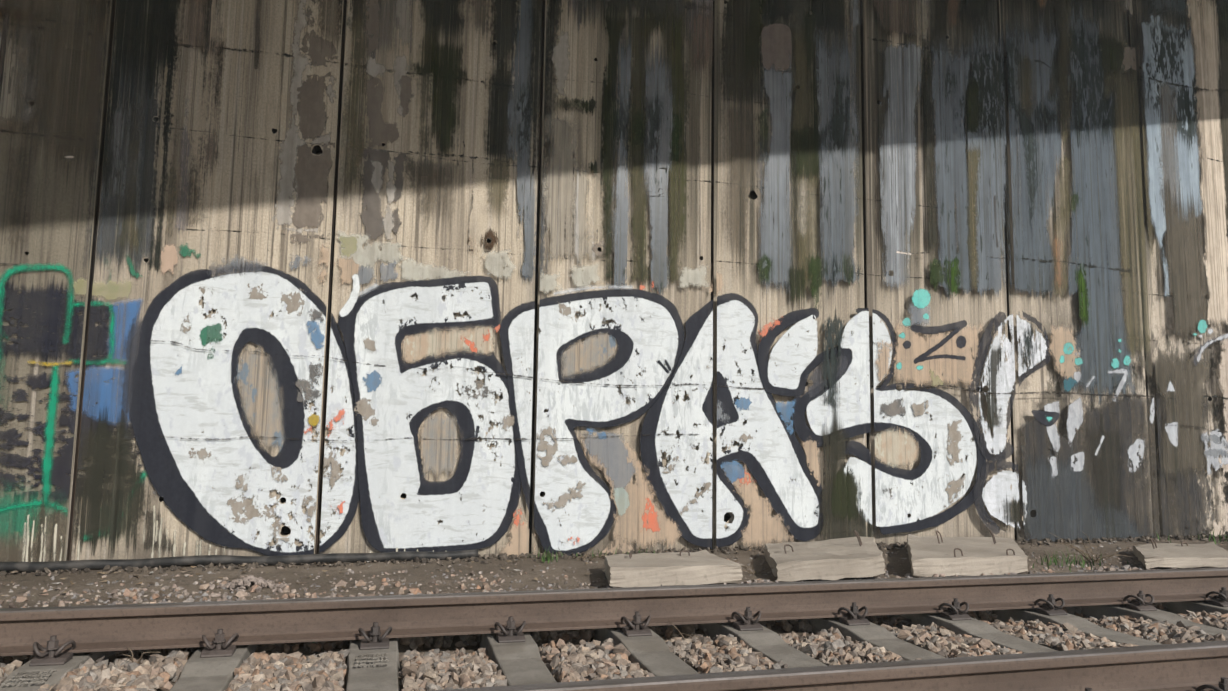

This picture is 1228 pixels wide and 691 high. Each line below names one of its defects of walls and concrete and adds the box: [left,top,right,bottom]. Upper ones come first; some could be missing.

peeling [180,315,223,359]
peeling [248,283,382,437]
peeling [464,380,492,400]
peeling [188,448,211,460]
peeling [227,474,289,543]
peeling [302,451,341,522]